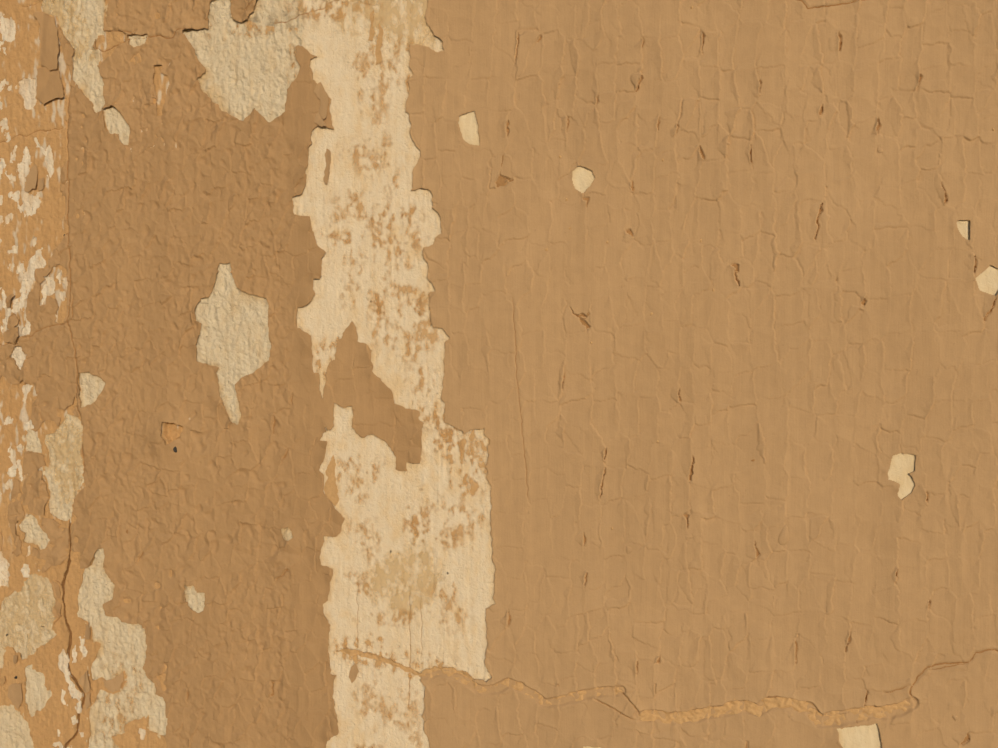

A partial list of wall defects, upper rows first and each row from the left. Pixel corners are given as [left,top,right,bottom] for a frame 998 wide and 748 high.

crack [798,0,865,9]
peeling [33,0,130,145]
crack [496,121,513,187]
crack [2,86,85,475]
peeling [177,0,496,748]
crack [573,312,590,329]
peeling [948,220,998,296]
peeling [888,453,916,500]
peeling [0,574,57,748]
crack [53,498,86,748]
crack [336,598,998,729]
peeling [824,724,882,748]